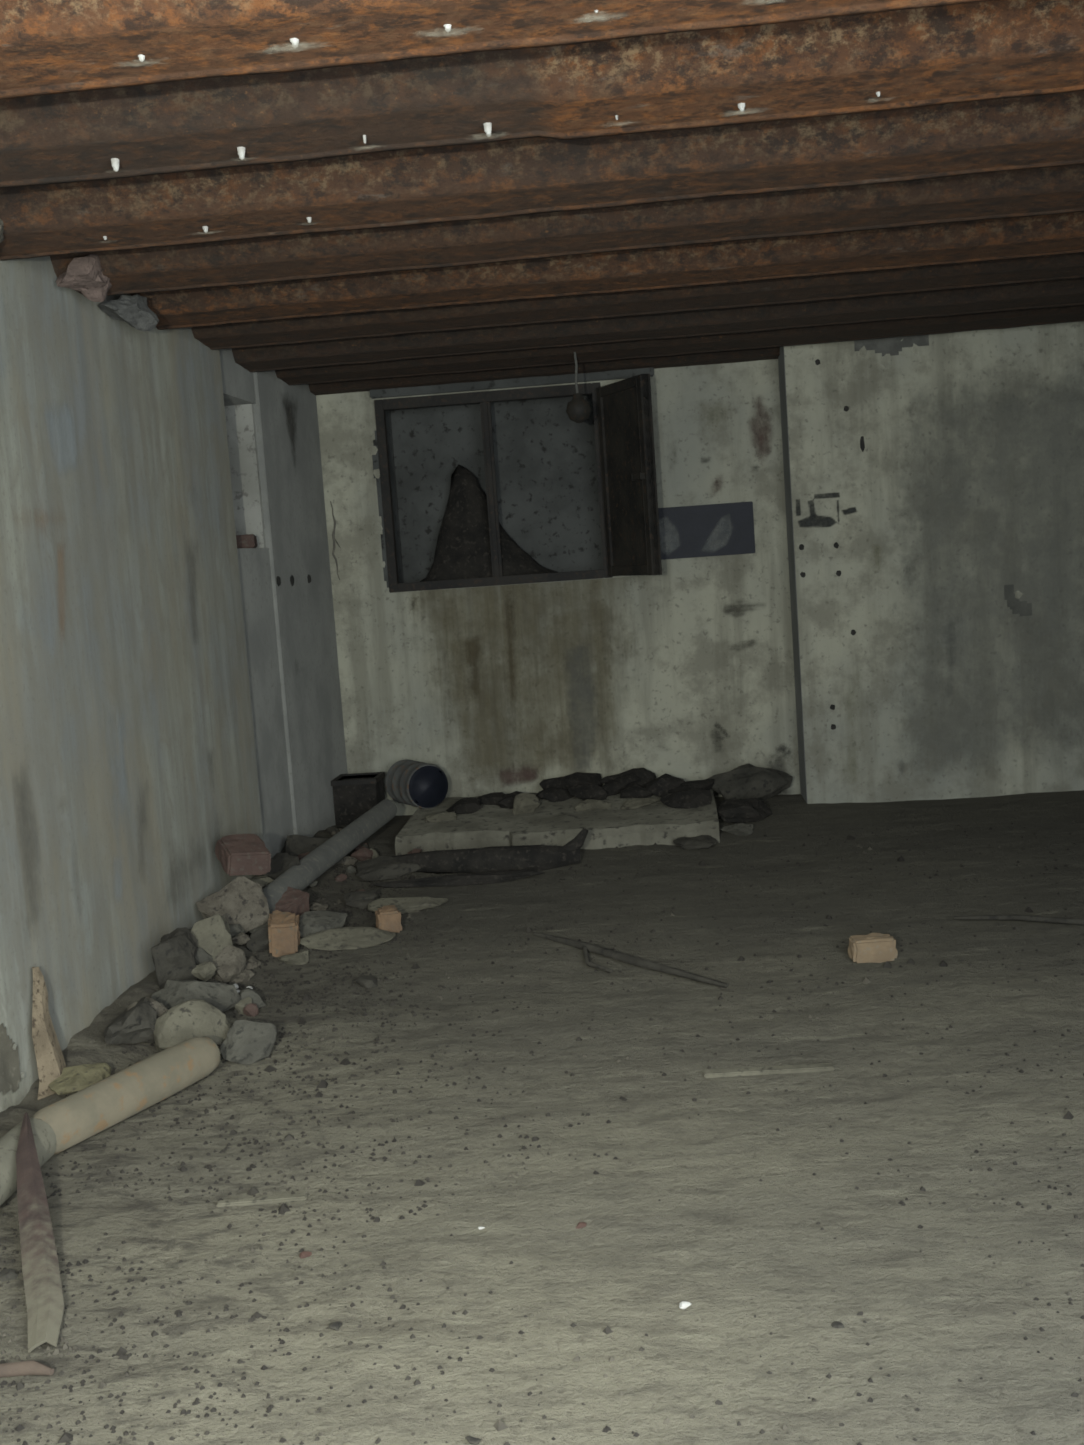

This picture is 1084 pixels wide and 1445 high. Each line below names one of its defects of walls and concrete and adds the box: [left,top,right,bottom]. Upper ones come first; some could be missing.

peeling [0,1023,25,1096]